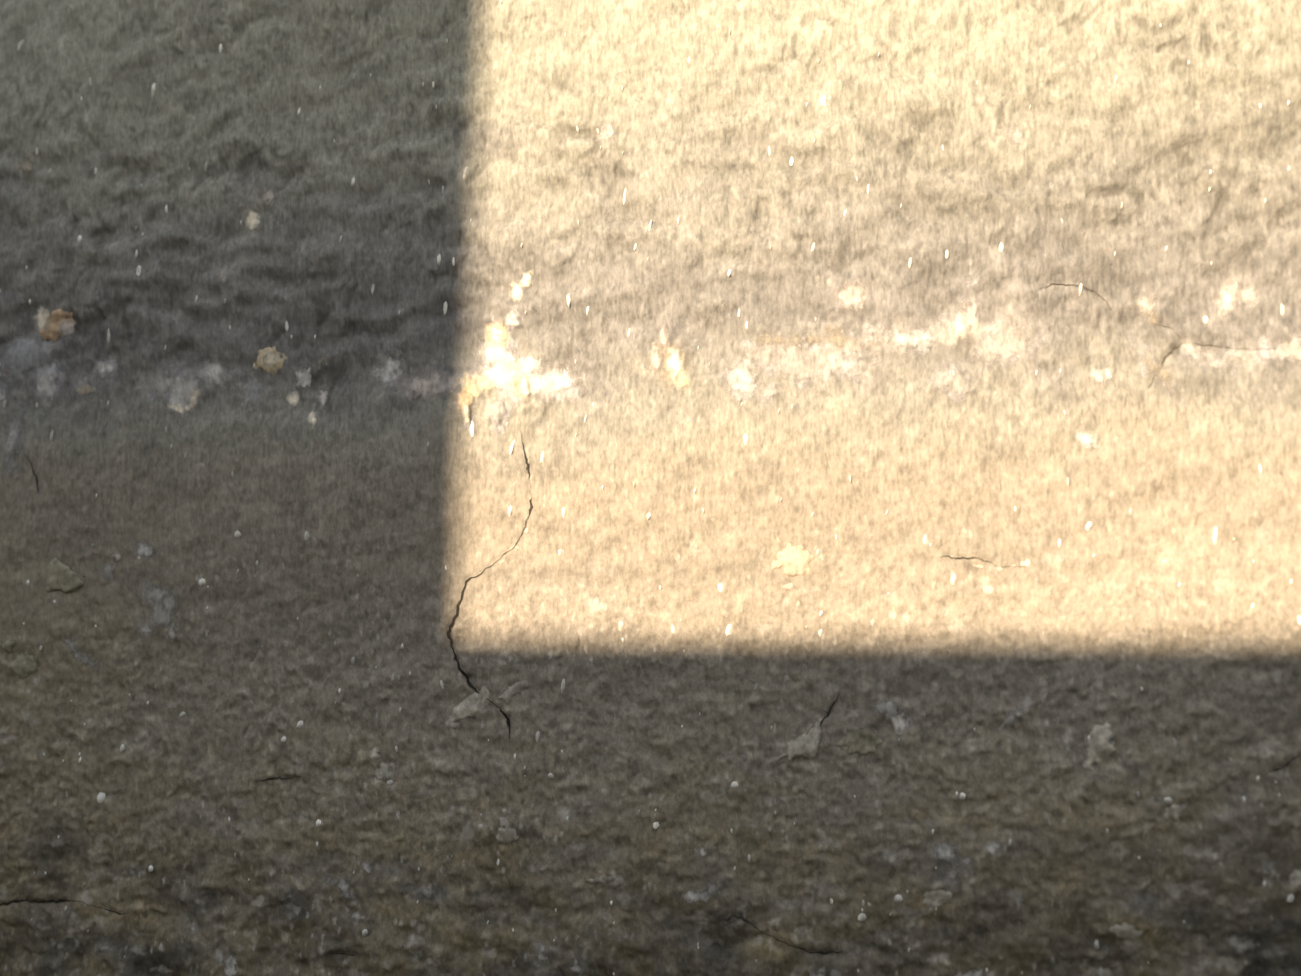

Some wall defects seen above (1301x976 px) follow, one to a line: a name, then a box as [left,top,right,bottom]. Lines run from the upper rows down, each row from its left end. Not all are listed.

water stain [1217,282,1258,311]
rust [37,308,76,342]
water stain [0,334,120,404]
water stain [150,361,260,416]
rust [253,346,287,375]
water stain [286,357,328,428]
water stain [376,275,585,433]
water stain [722,281,1039,403]
water stain [1181,338,1301,367]
crack [446,419,533,739]
crack [0,899,129,915]
crack [708,914,842,955]